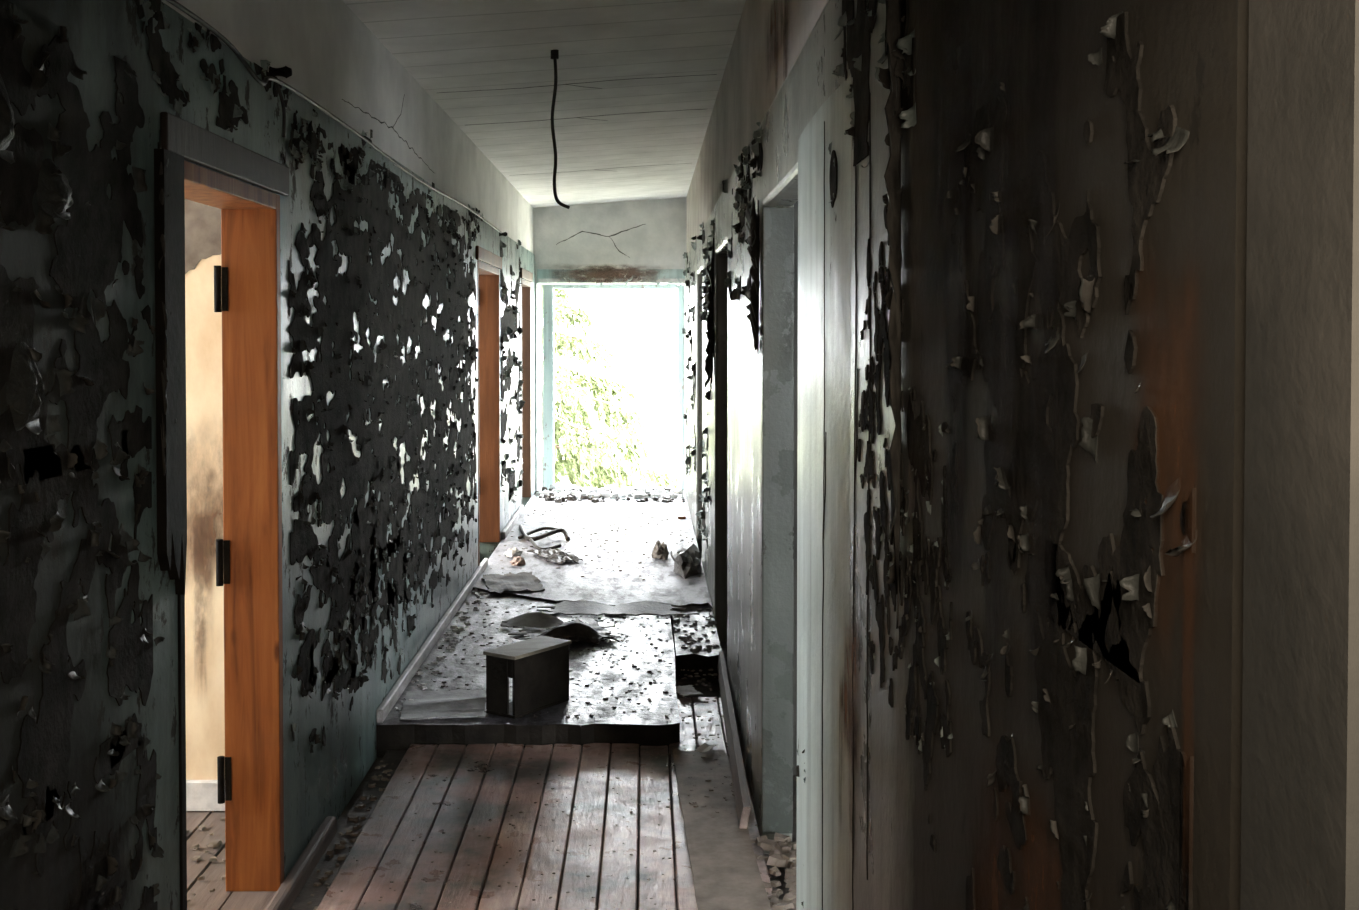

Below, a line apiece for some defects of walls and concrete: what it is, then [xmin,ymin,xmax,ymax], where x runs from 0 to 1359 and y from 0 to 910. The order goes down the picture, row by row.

peeling [187,22,249,133]
peeling [185,199,221,274]
peeling [253,60,485,711]
peeling [500,238,566,503]
crack [556,224,645,257]
peeling [624,122,764,548]